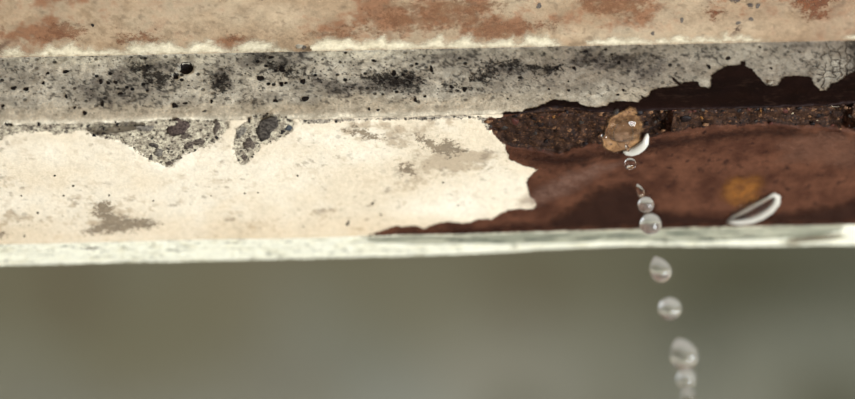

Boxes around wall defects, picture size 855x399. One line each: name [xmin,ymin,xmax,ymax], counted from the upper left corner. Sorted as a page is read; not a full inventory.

corrosion [475,21,557,41]
corrosion [790,0,836,20]
damp [3,40,321,89]
spalling [173,62,193,79]
damp [203,66,264,109]
damp [310,33,752,96]
crack [815,46,855,87]
spalling [0,94,855,167]
damp [364,54,855,245]
corrosion [724,177,759,206]